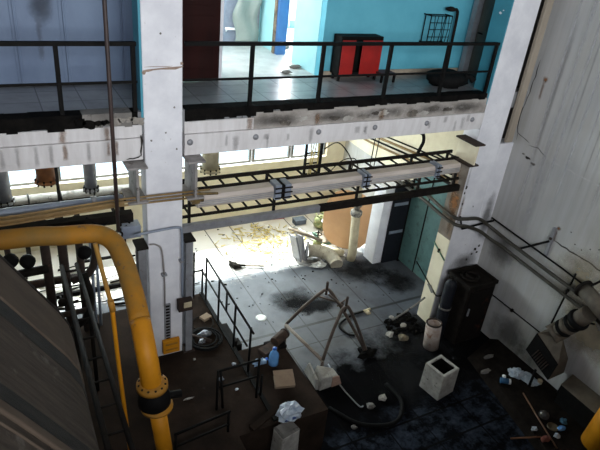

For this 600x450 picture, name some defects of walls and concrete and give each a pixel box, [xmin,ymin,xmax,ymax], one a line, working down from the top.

crack [516,62,540,142]
spalling [67,117,145,130]
crack [127,135,143,160]
crack [555,241,600,271]